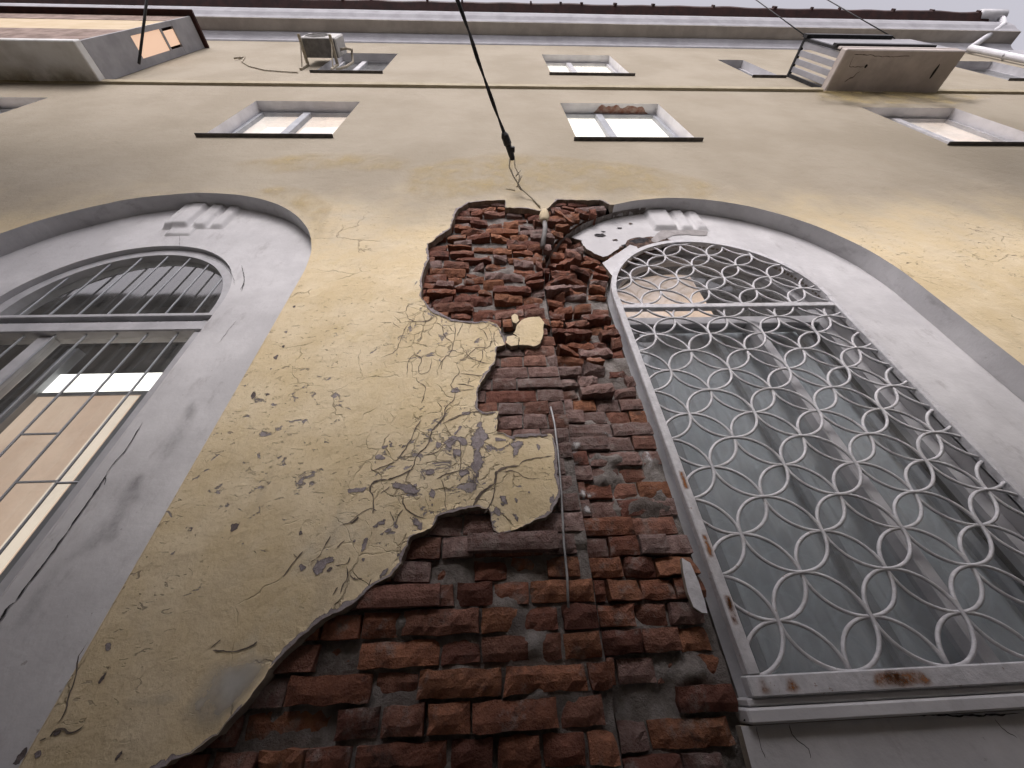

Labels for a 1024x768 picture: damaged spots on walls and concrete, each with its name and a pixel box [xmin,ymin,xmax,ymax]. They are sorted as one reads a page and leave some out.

crack [845,54,902,82]
crack [283,304,550,594]
flaking render [150,199,746,768]
corrosion [875,672,930,685]